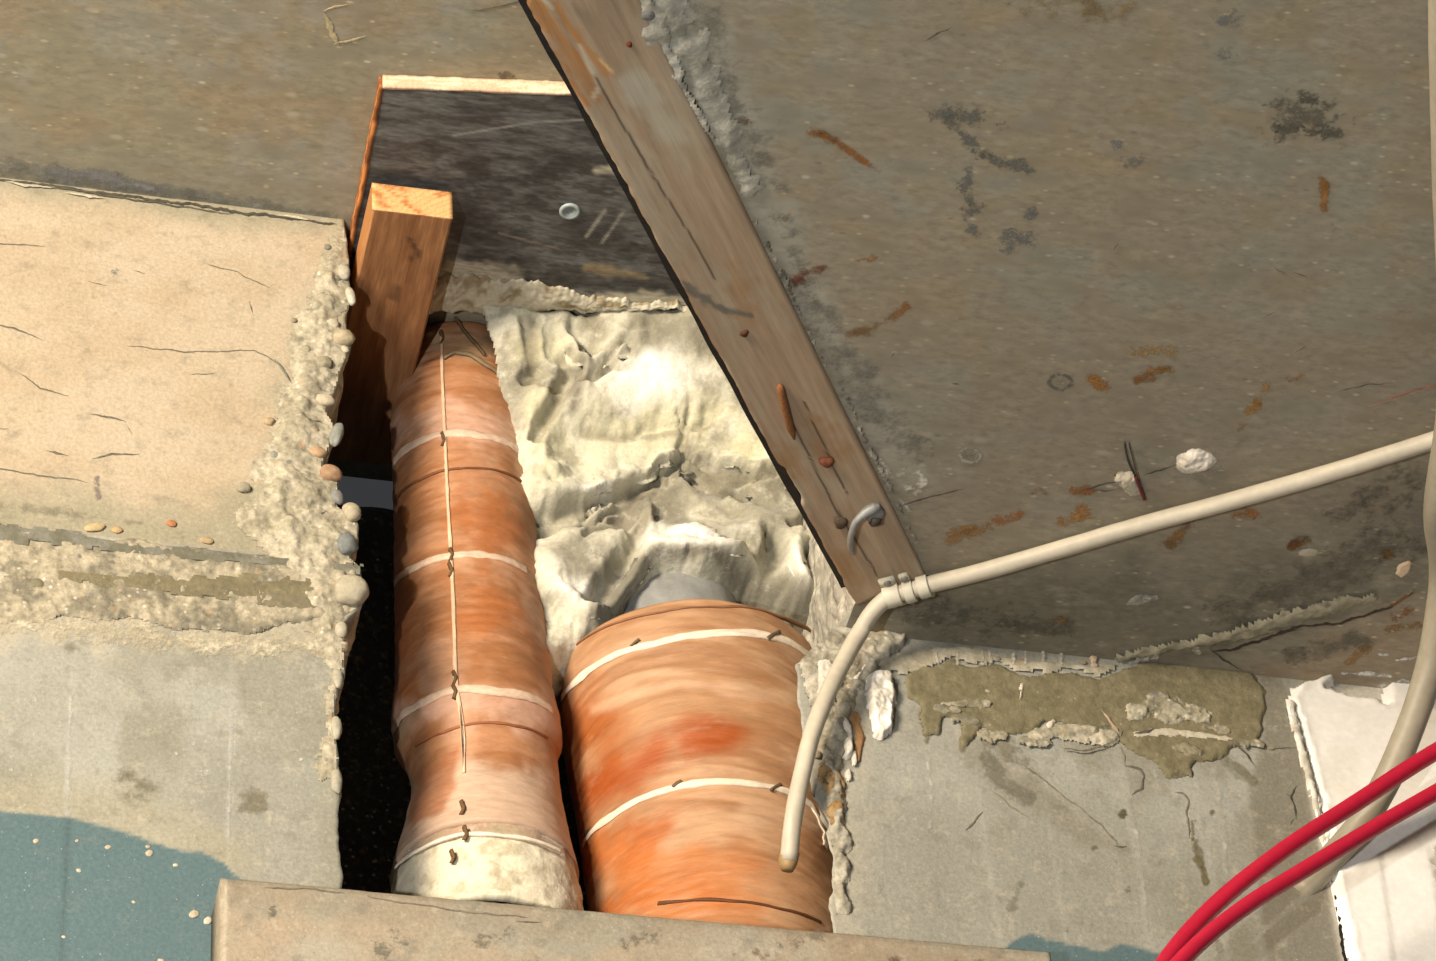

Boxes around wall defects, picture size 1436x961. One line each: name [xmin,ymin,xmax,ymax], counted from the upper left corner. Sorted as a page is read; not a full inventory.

water stain [1262,90,1343,143]
corrosion [808,130,869,166]
water stain [929,108,1035,234]
corrosion [1320,177,1329,212]
corrosion [792,265,825,287]
corrosion [848,301,910,337]
spalling [0,225,369,794]
crack [1114,590,1415,670]
peeling [933,691,1265,758]